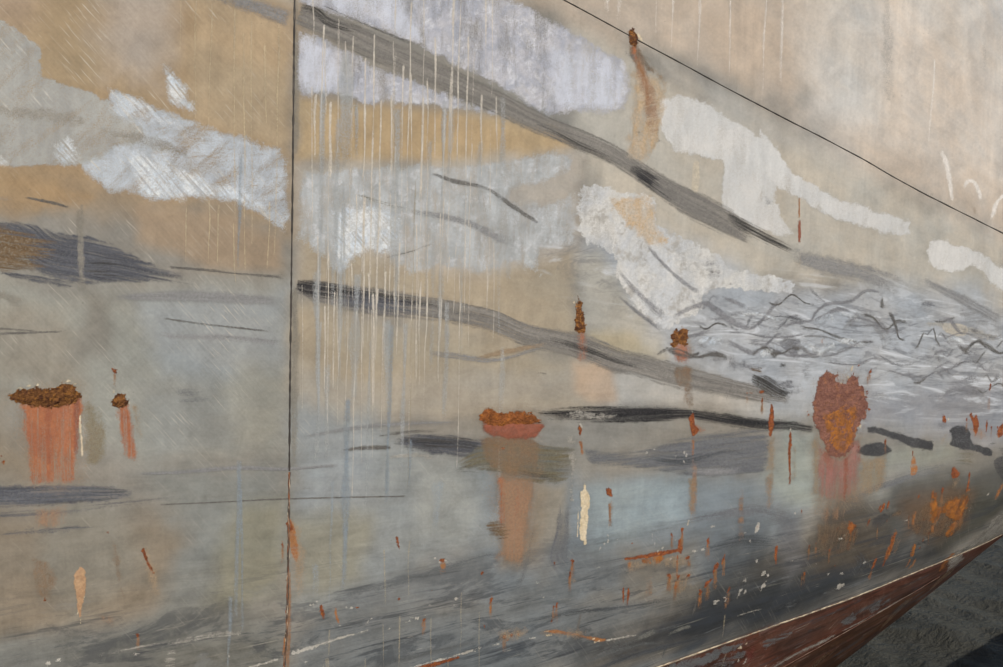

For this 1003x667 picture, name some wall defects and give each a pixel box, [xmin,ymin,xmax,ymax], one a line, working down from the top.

rust [625,27,667,162]
rust [572,296,587,360]
rust [1,379,107,529]
rust [111,368,144,461]
rust [479,401,547,569]
rust [670,326,702,525]
rust [746,390,777,508]
rust [788,428,797,483]
rust [801,361,970,579]
rust [281,518,307,667]